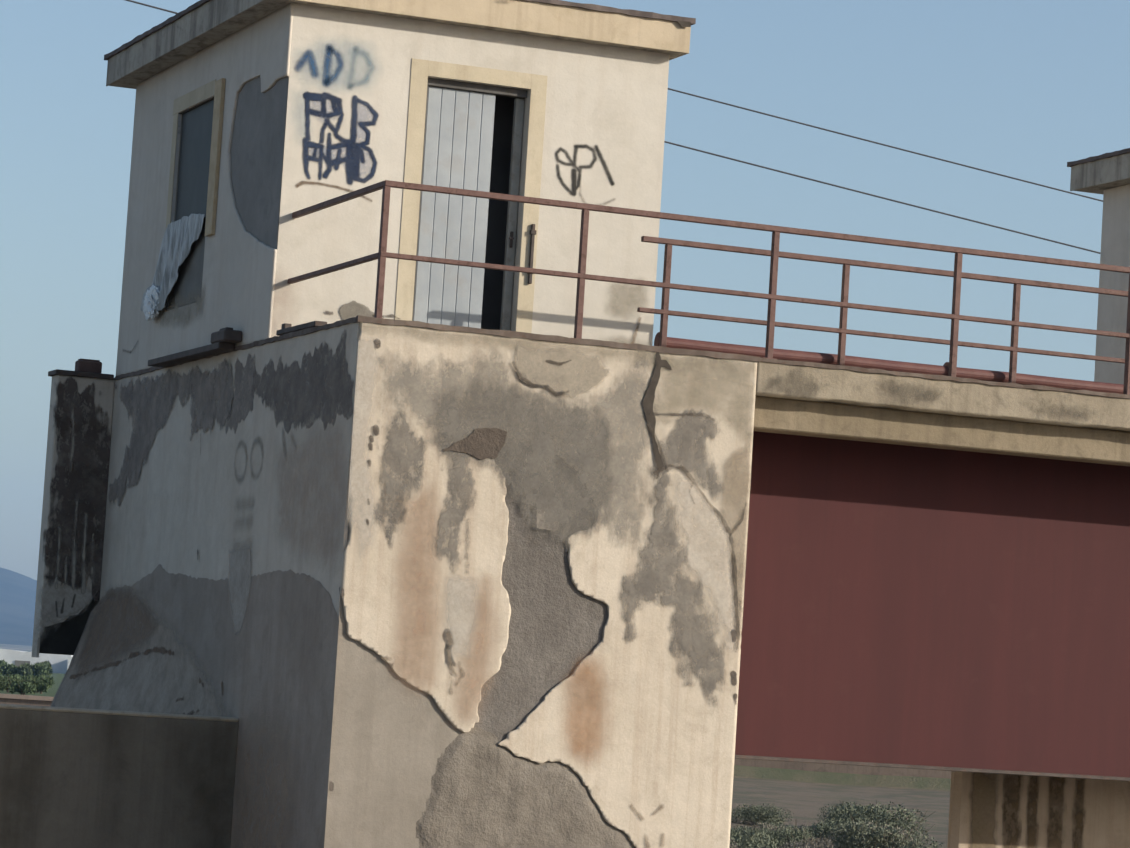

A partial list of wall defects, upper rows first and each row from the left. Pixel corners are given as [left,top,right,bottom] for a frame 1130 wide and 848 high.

peeling [231,77,288,249]
damp [43,377,111,603]
peeling [50,447,608,848]
damp [374,357,647,640]
peeling [621,410,737,702]
crack [643,352,746,648]
damp [970,772,1085,848]